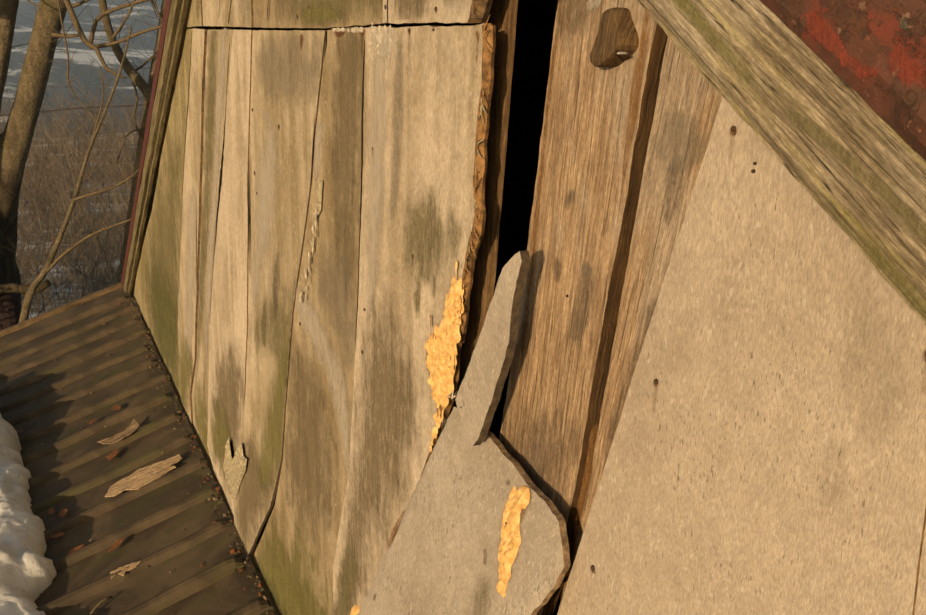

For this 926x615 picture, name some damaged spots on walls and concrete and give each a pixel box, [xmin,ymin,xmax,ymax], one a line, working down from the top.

leakage [282,0,382,348]
leakage [406,196,457,310]
leakage [212,347,244,457]
leakage [257,264,333,528]
leakage [333,323,415,615]
peeling [424,261,464,452]
peeling [496,486,530,598]